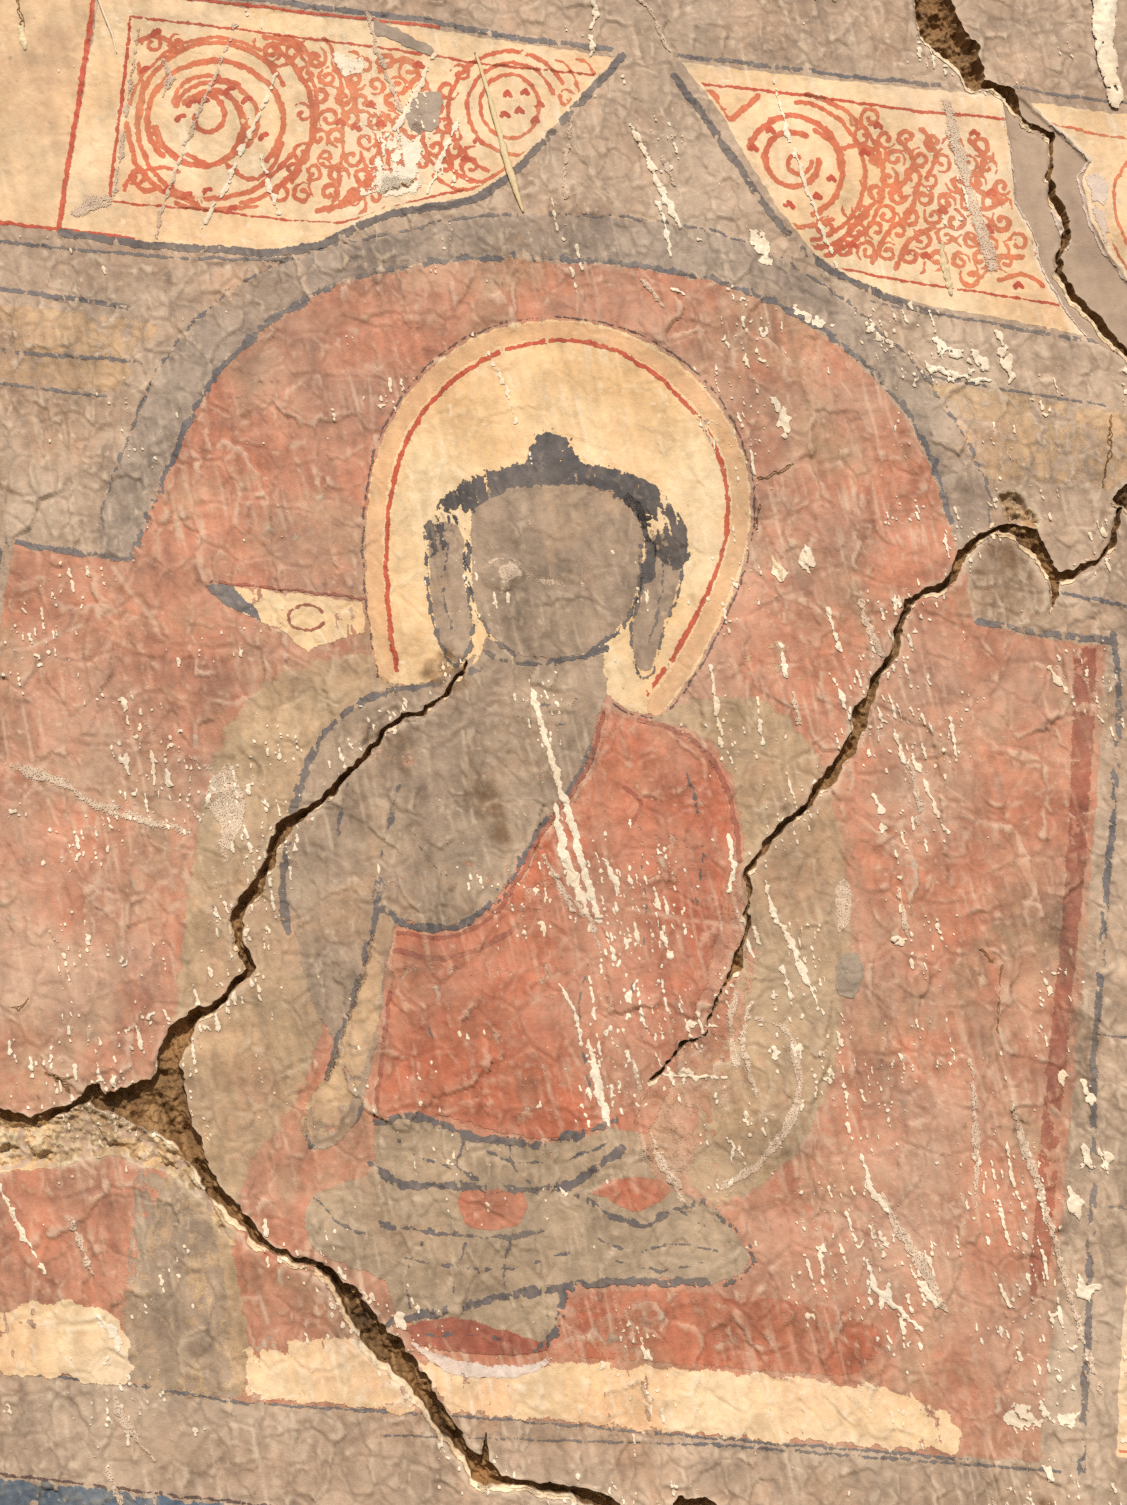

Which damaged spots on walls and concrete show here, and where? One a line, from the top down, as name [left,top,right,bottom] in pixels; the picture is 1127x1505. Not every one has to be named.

crack [913,0,1127,363]
peeling [749,229,773,266]
peeling [793,304,835,328]
peeling [866,323,895,348]
peeling [925,329,1016,385]
crack [634,414,1127,1124]
crack [0,661,621,1505]
spalling [0,1104,236,1247]
crack [673,1495,717,1505]